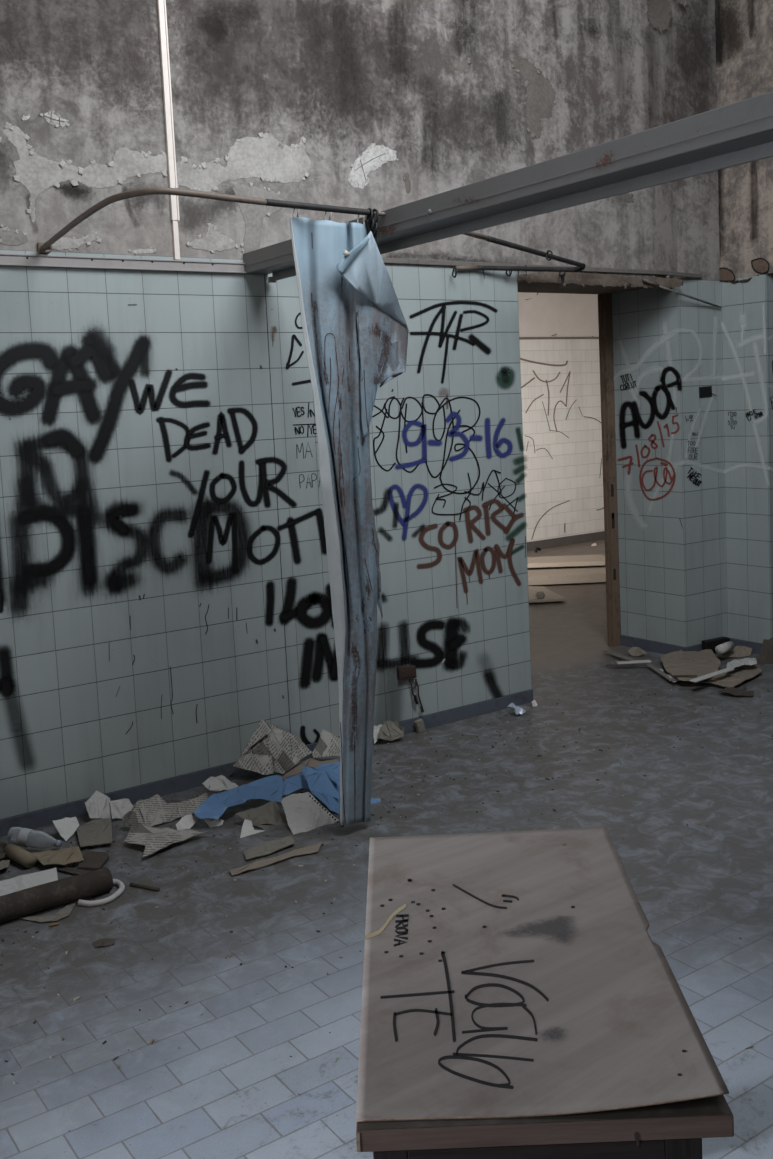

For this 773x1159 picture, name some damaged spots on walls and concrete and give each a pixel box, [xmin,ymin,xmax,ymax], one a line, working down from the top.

leakage [715,0,754,64]
peeling [0,110,312,253]
peeling [348,143,399,189]